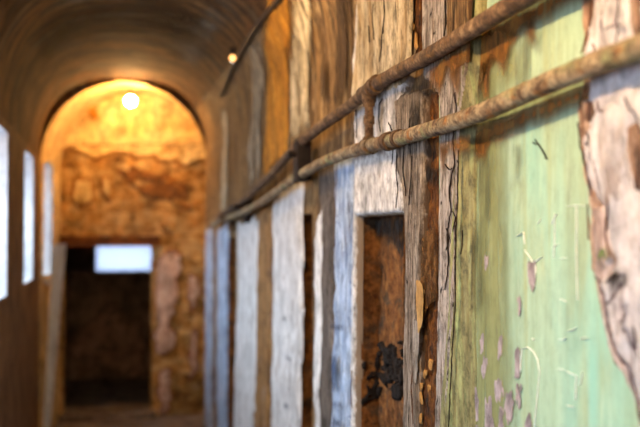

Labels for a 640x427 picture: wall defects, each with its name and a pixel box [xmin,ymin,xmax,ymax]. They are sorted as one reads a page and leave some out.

rust [263,0,290,175]
spalling [430,92,439,120]
rust [430,50,467,91]
rust [439,88,590,166]
rust [478,0,572,97]
peeling [582,0,640,55]
spalling [412,136,439,427]
crack [444,131,463,427]
peeling [474,138,522,427]
peeling [527,260,536,292]
peeling [577,62,640,423]